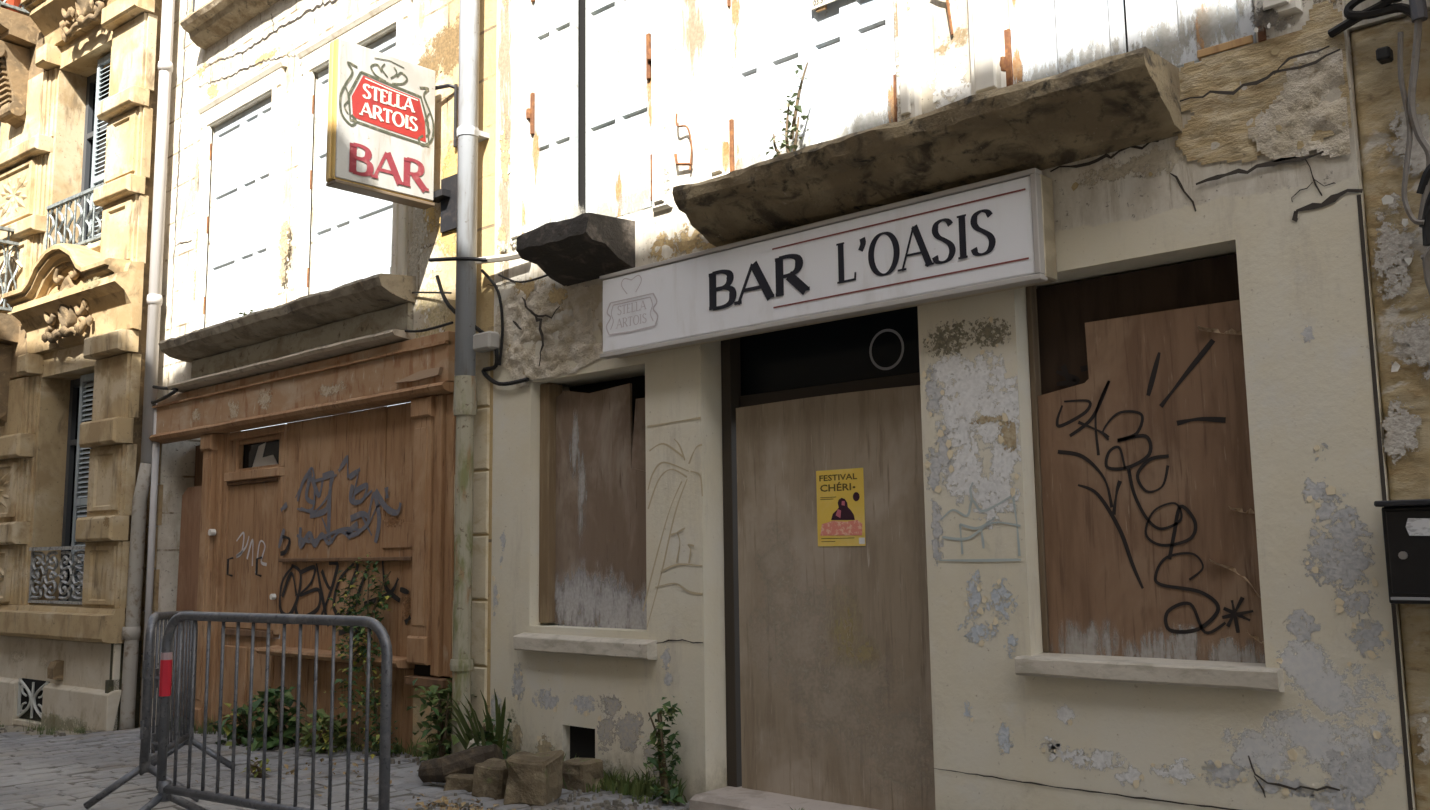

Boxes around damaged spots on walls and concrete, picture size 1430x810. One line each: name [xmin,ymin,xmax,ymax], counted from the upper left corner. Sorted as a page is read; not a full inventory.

peeling [499,113,511,184]
spalling [1071,0,1352,191]
flaking render [1384,104,1430,176]
peeling [497,215,517,262]
spalling [494,277,603,389]
flaking render [1372,192,1430,380]
peeling [922,344,1021,566]
flaking render [1382,396,1422,465]
peeling [958,570,1018,659]
peeling [1035,477,1430,810]
peeling [491,662,659,780]